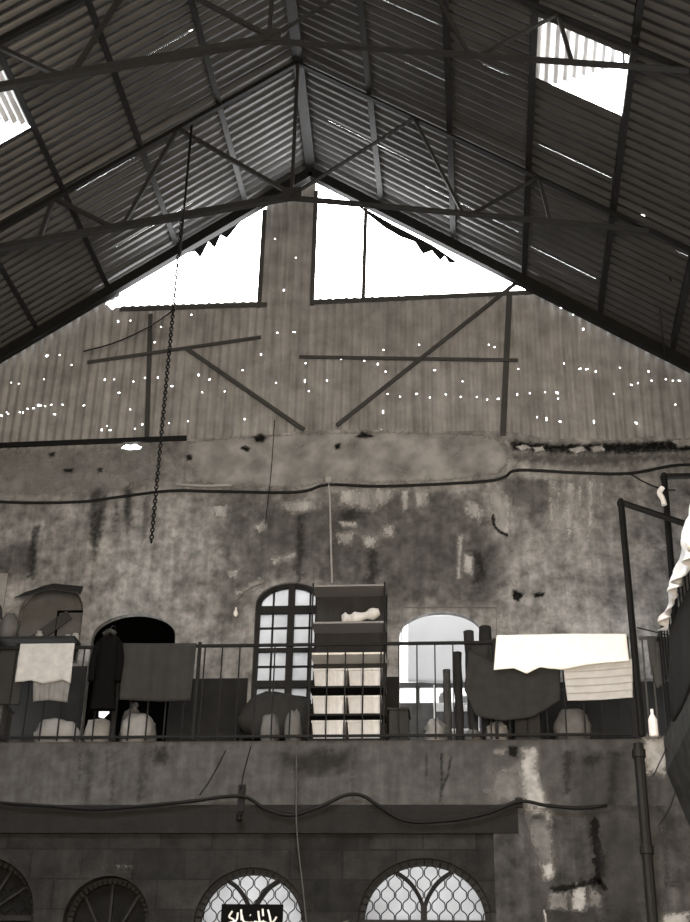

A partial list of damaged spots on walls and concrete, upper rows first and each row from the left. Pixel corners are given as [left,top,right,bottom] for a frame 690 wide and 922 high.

peeling [484,746,570,880]
spalling [549,884,601,911]